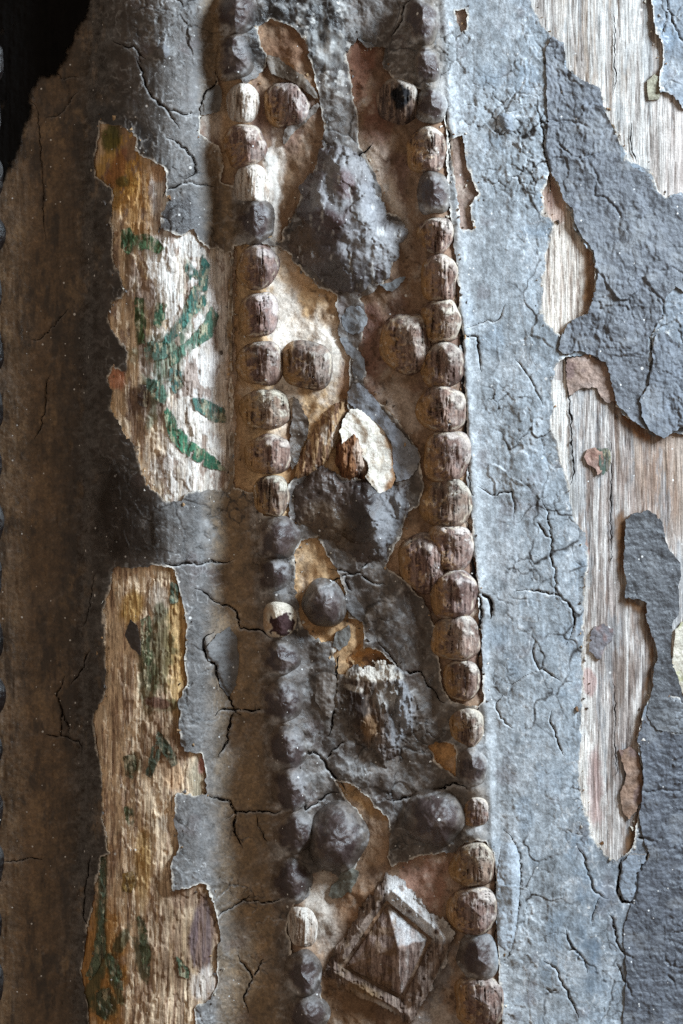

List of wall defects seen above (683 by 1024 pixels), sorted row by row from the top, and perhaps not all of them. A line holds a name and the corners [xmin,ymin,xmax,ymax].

peeling [94,19,479,502]
crack [454,292,504,434]
crack [565,354,575,485]
crack [202,632,260,757]
peeling [294,536,394,718]
peeling [386,506,433,577]
peeling [439,556,485,706]
crack [466,521,493,672]
crack [468,465,576,645]
peeling [530,0,683,1024]
peeling [81,565,221,1024]
crack [578,837,649,982]